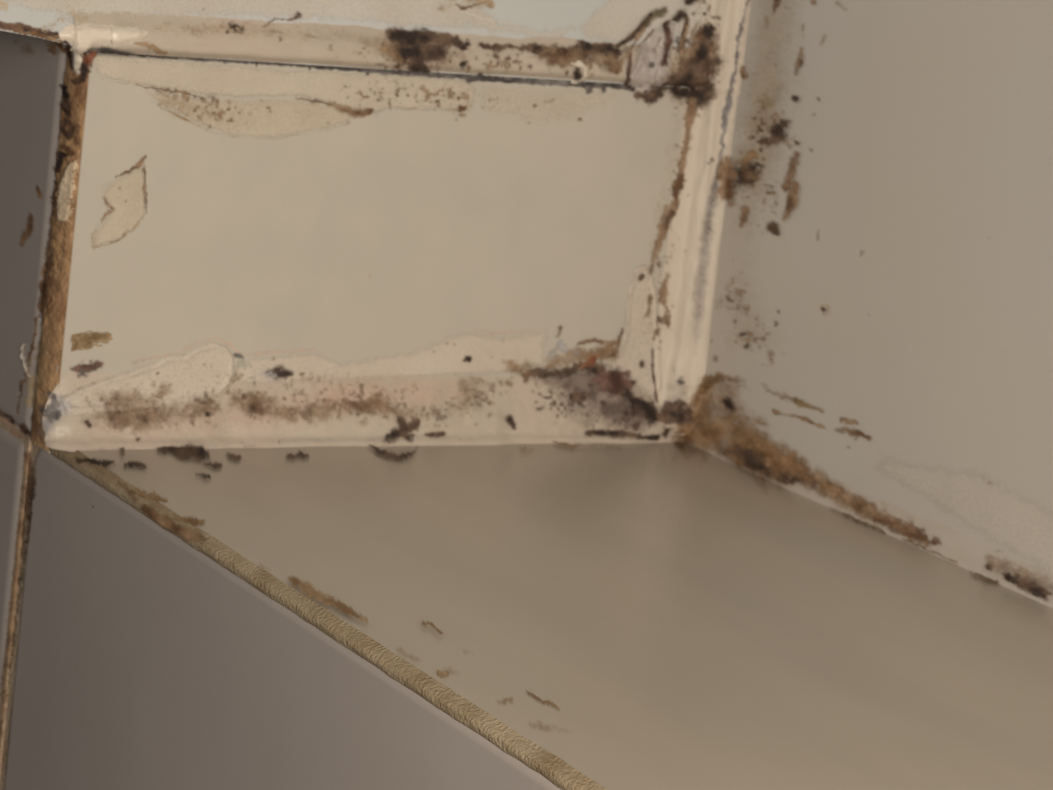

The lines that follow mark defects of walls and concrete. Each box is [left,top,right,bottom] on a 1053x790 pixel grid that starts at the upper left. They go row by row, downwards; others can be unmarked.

water stain [0,0,92,216]
water stain [296,85,469,131]
peeling [92,163,145,247]
water stain [378,0,721,339]
water stain [702,0,816,356]
water stain [17,230,76,436]
water stain [62,331,497,479]
water stain [509,361,693,448]
water stain [119,481,206,540]
water stain [839,494,957,563]
water stain [288,576,368,622]
water stain [972,556,1051,600]